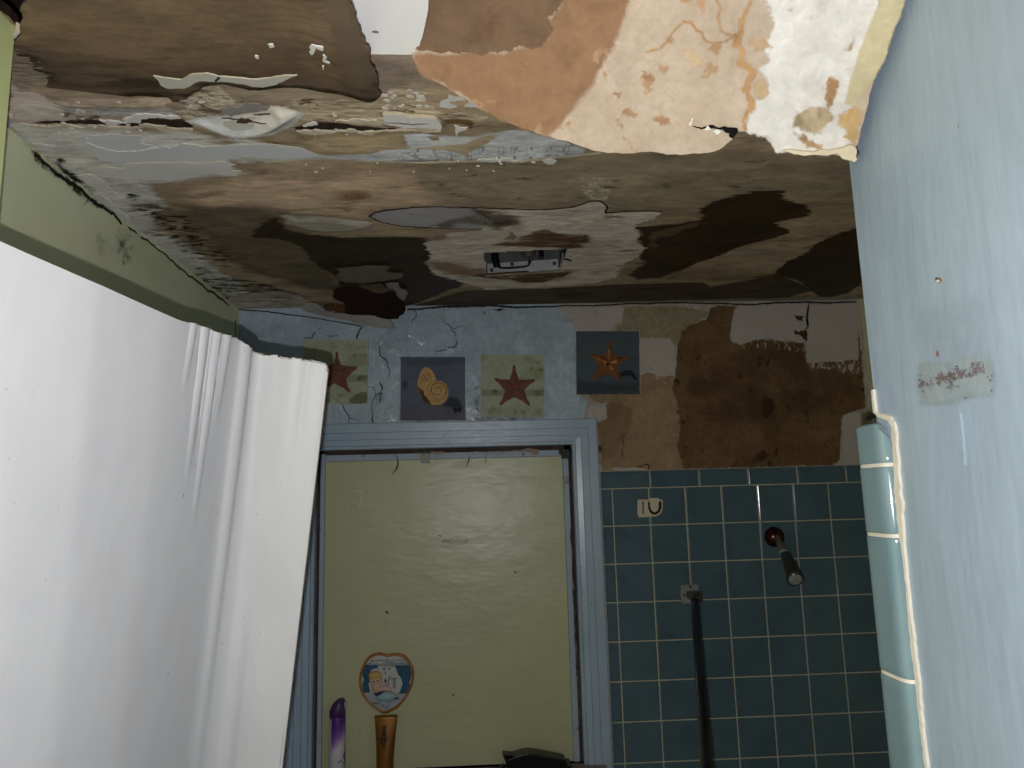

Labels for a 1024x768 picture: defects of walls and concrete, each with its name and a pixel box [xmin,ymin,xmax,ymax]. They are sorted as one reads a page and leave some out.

flaking render [153,72,297,120]
peeling [746,0,880,157]
peeling [6,80,601,329]
water stain [126,0,906,471]
crack [335,447,558,455]
peeling [556,297,877,471]
corrosion [917,361,993,399]